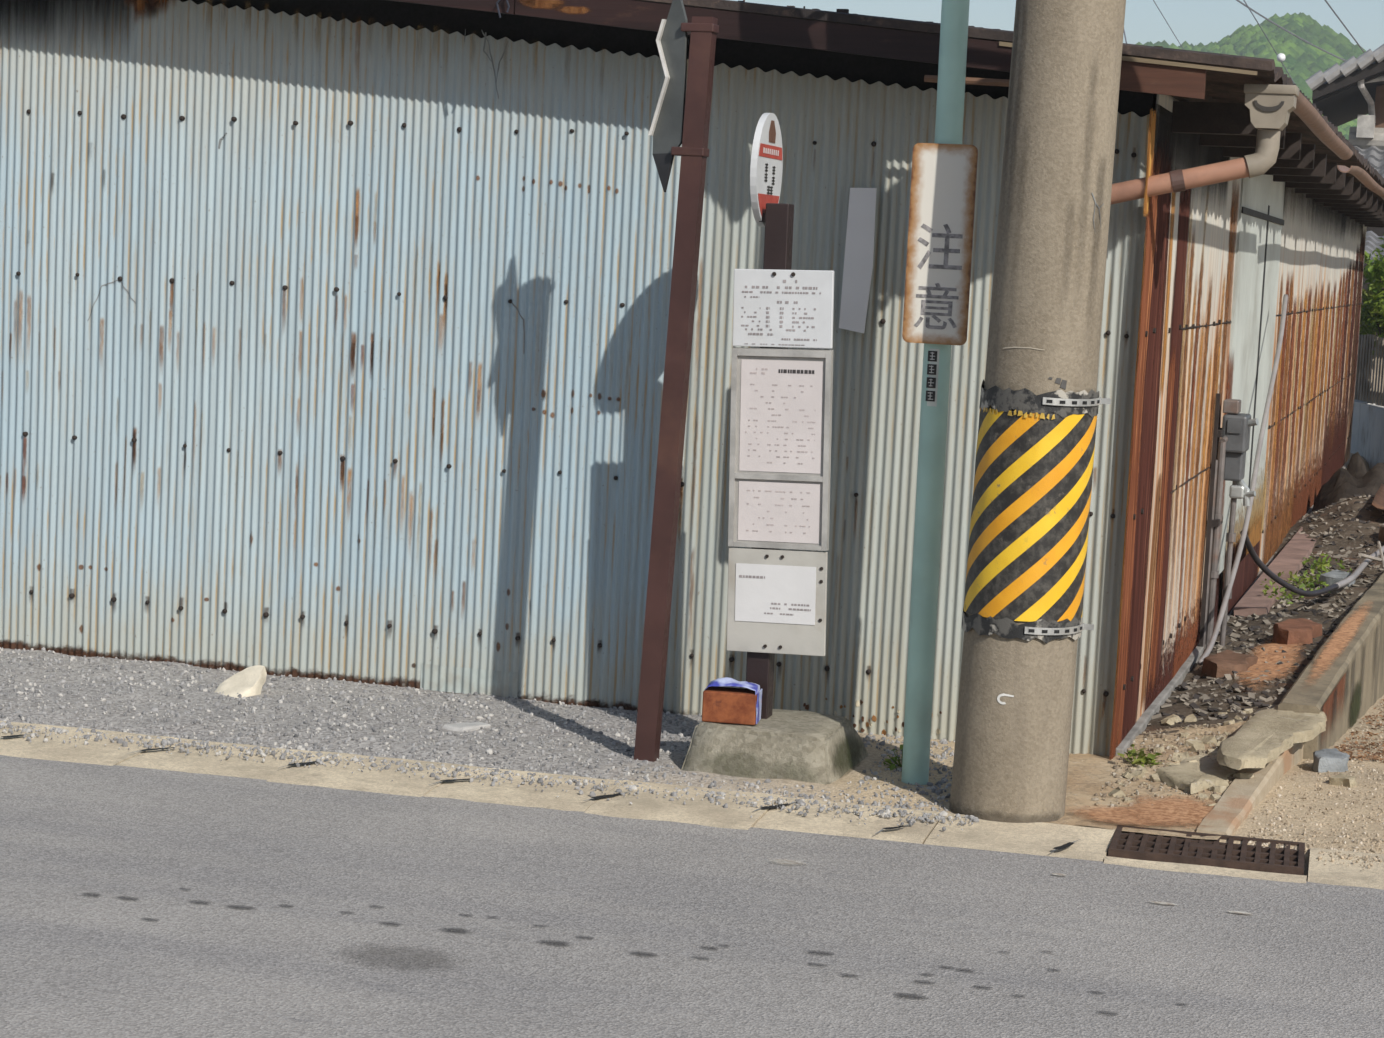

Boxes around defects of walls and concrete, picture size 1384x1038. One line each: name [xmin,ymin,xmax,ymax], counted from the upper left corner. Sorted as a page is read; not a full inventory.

corrosion [127,0,168,14]
corrosion [437,265,448,315]
corrosion [351,334,374,366]
corrosion [433,390,444,443]
corrosion [1103,109,1371,760]
corrosion [6,438,26,491]
corrosion [0,626,246,672]
corrosion [266,663,459,694]
corrosion [520,696,638,711]